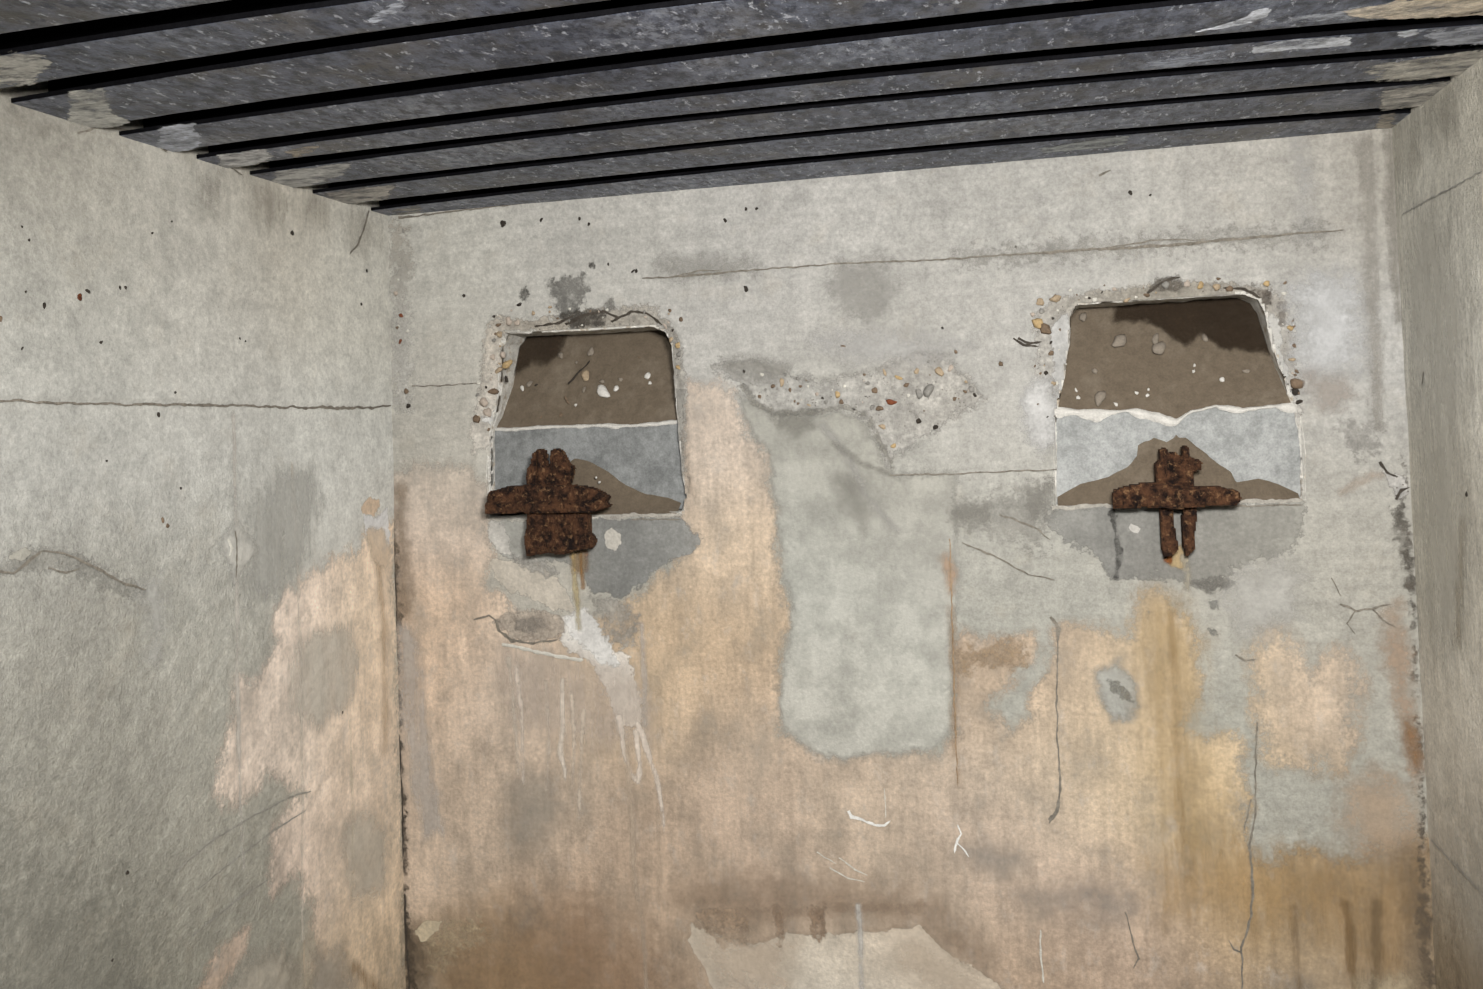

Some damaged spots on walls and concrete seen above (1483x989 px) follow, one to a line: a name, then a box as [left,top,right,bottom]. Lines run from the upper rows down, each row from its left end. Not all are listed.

crack [0,383,477,410]
spalling [468,263,688,473]
spalling [711,335,982,468]
crack [890,468,1058,476]
spalling [1018,276,1305,448]
leakage [1289,273,1376,409]
leakage [560,574,665,894]
crack [1048,616,1062,824]
leakage [1346,480,1483,989]
leakage [398,695,475,989]
peeling [688,905,1001,989]
crack [1229,722,1258,989]